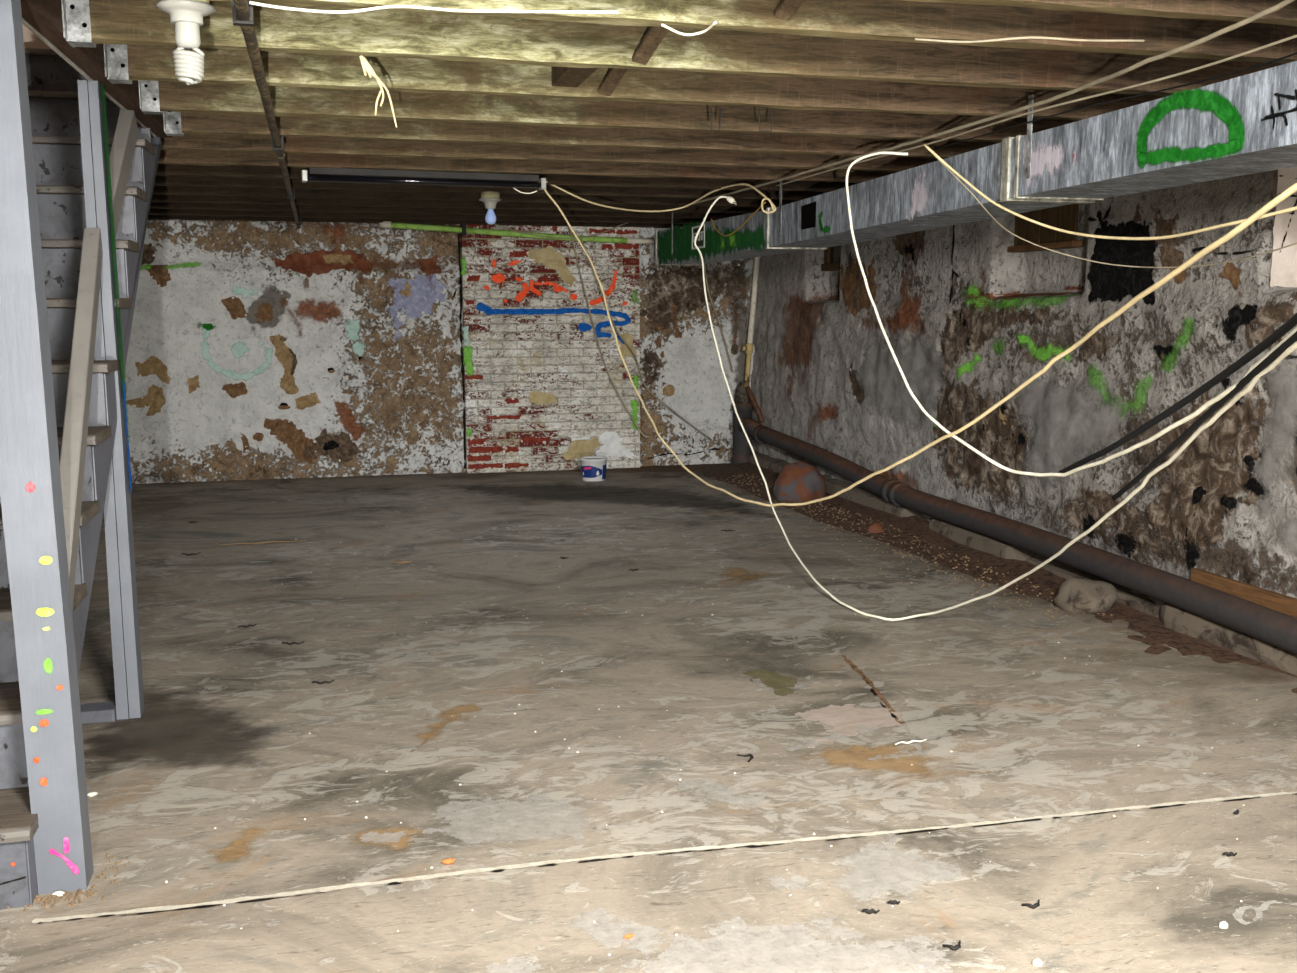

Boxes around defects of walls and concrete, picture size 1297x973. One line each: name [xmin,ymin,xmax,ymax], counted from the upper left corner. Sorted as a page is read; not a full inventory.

peeling [141,243,171,290]
flaking render [589,228,639,250]
spalling [840,252,877,316]
spalling [892,230,925,267]
peeling [126,356,201,416]
peeling [198,286,550,470]
peeling [640,351,675,396]
spalling [849,364,864,404]
spalling [931,294,1123,504]
spalling [1052,369,1297,572]
crack [842,655,906,724]
crack [32,792,1297,924]